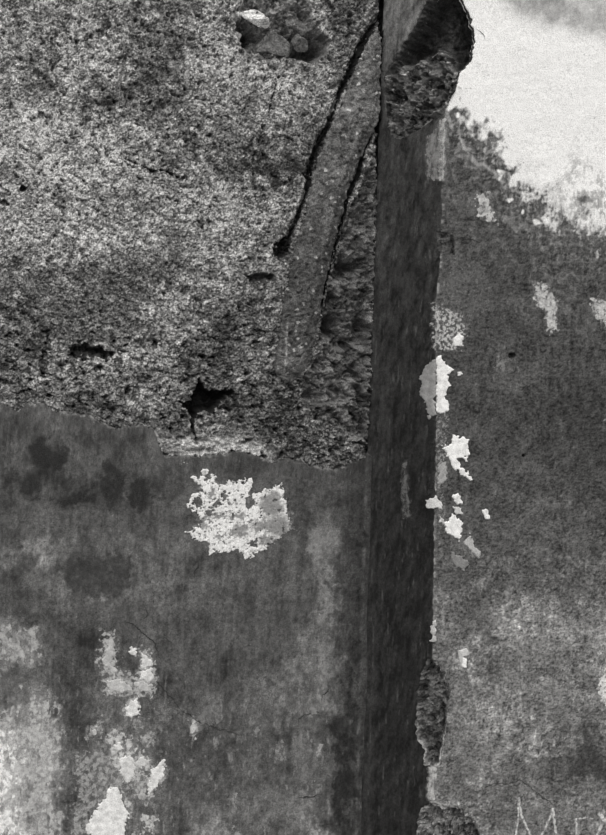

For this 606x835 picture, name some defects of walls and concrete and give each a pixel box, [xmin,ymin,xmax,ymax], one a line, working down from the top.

spalling [233,0,332,64]
spalling [383,0,476,181]
crack [125,159,185,179]
crack [281,0,385,452]
peeling [533,282,560,333]
peeling [589,298,606,324]
peeling [419,232,492,571]
leakage [57,463,151,510]
peeling [184,469,297,560]
peeling [429,620,437,642]
peeling [0,624,172,835]
spalling [415,659,480,835]